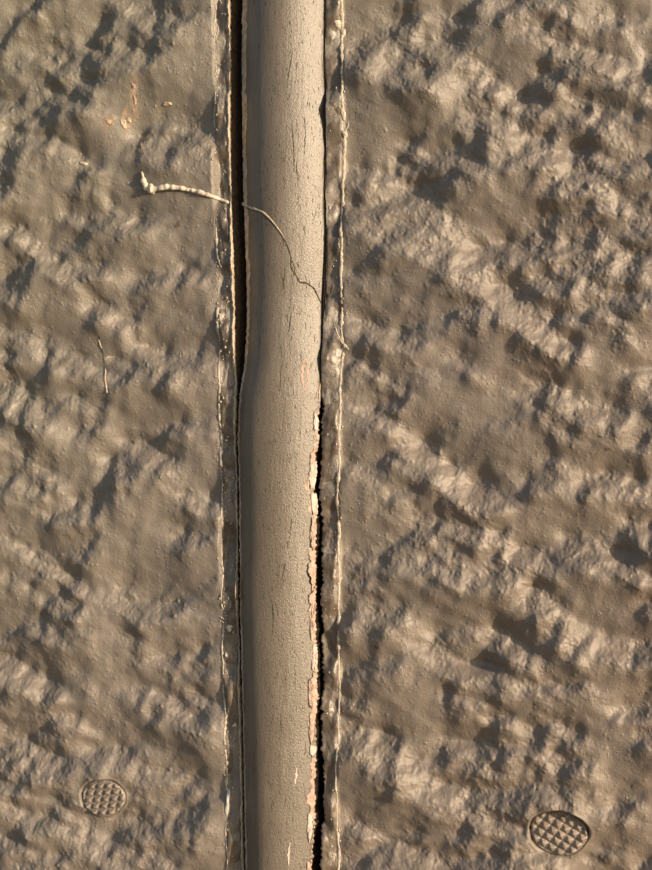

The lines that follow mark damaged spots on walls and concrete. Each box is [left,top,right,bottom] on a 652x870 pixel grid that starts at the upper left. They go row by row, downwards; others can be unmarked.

crack [230,0,327,870]
peeling [303,384,321,870]